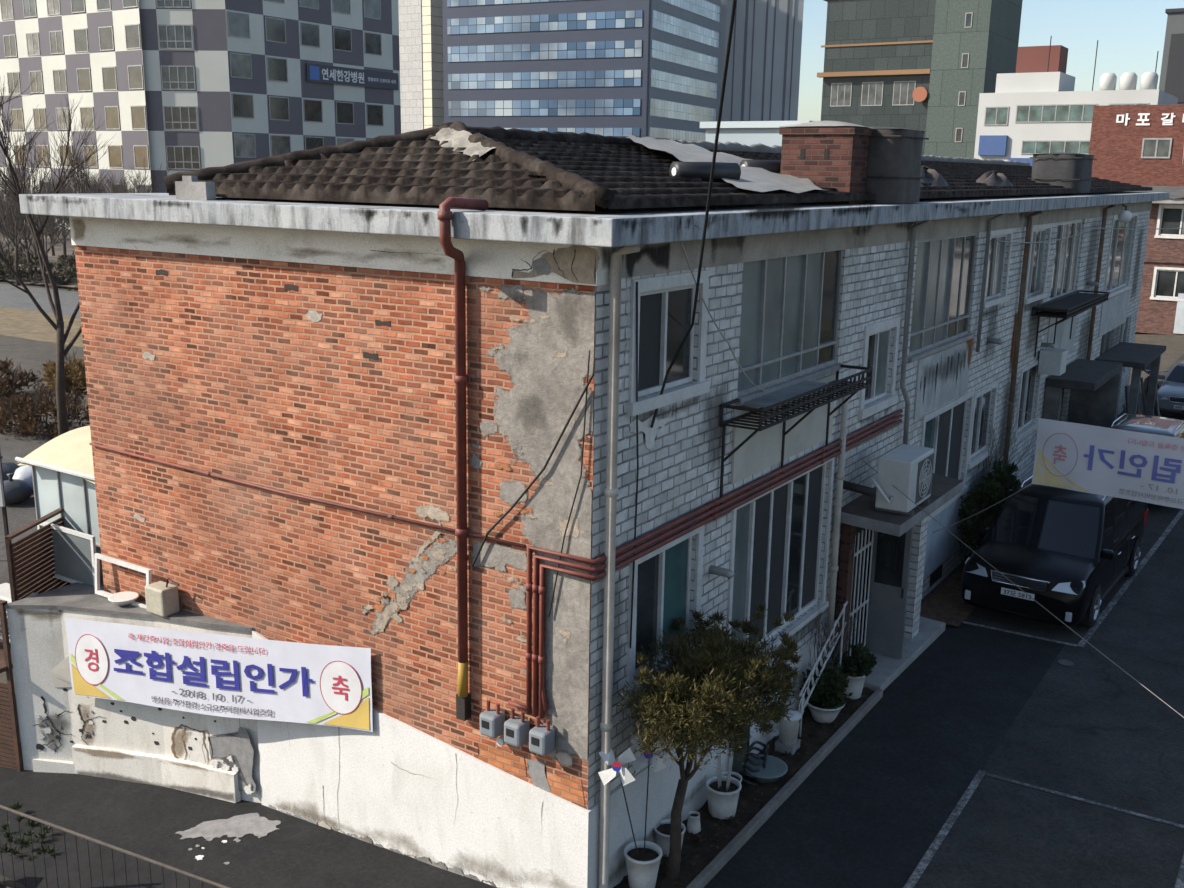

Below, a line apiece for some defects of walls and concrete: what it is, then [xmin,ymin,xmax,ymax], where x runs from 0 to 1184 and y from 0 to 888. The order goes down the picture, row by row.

crack [512,250,546,277]
peeling [558,517,580,539]
spalling [152,717,256,794]